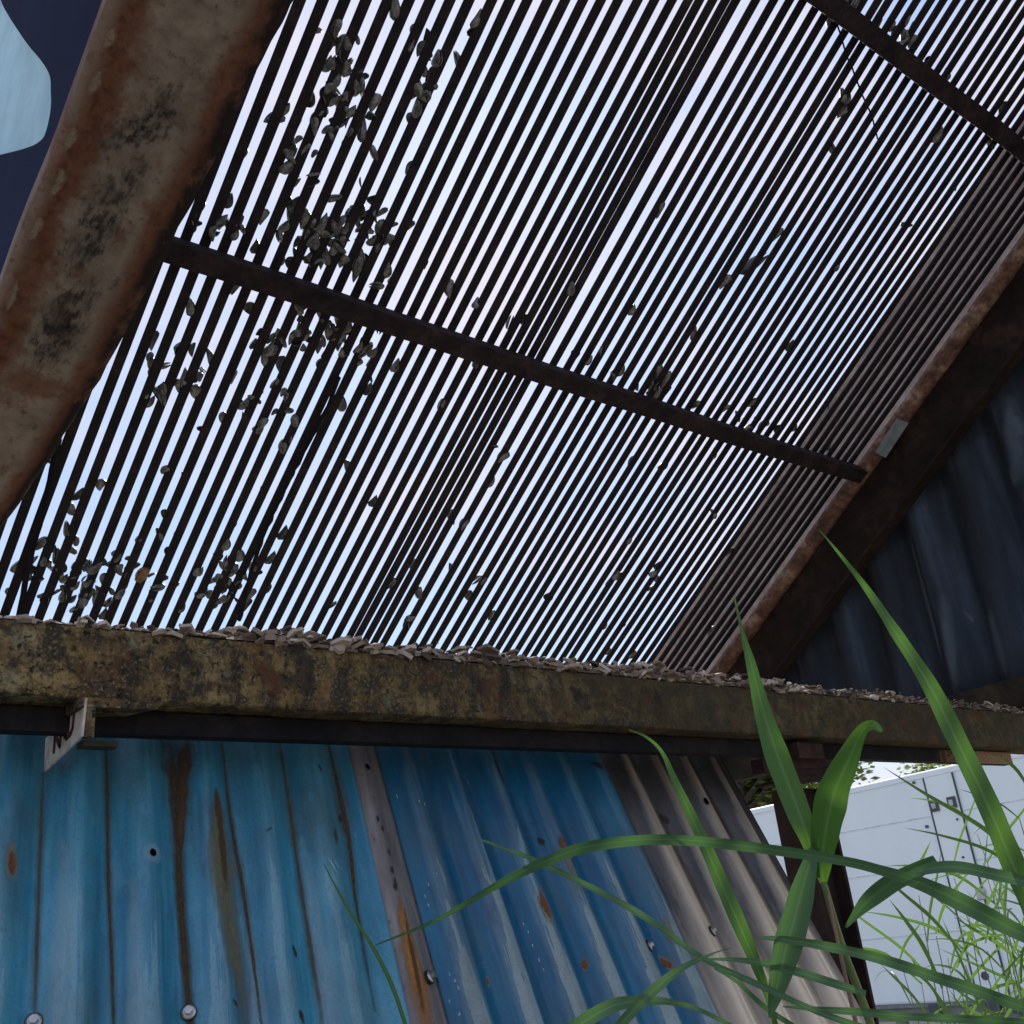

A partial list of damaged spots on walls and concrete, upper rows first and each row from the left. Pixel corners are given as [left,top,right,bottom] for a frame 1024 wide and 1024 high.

rust [25,83,183,363]
rust [7,844,16,874]
rust [165,744,192,1005]
rust [210,778,261,1021]
rust [391,867,430,1024]